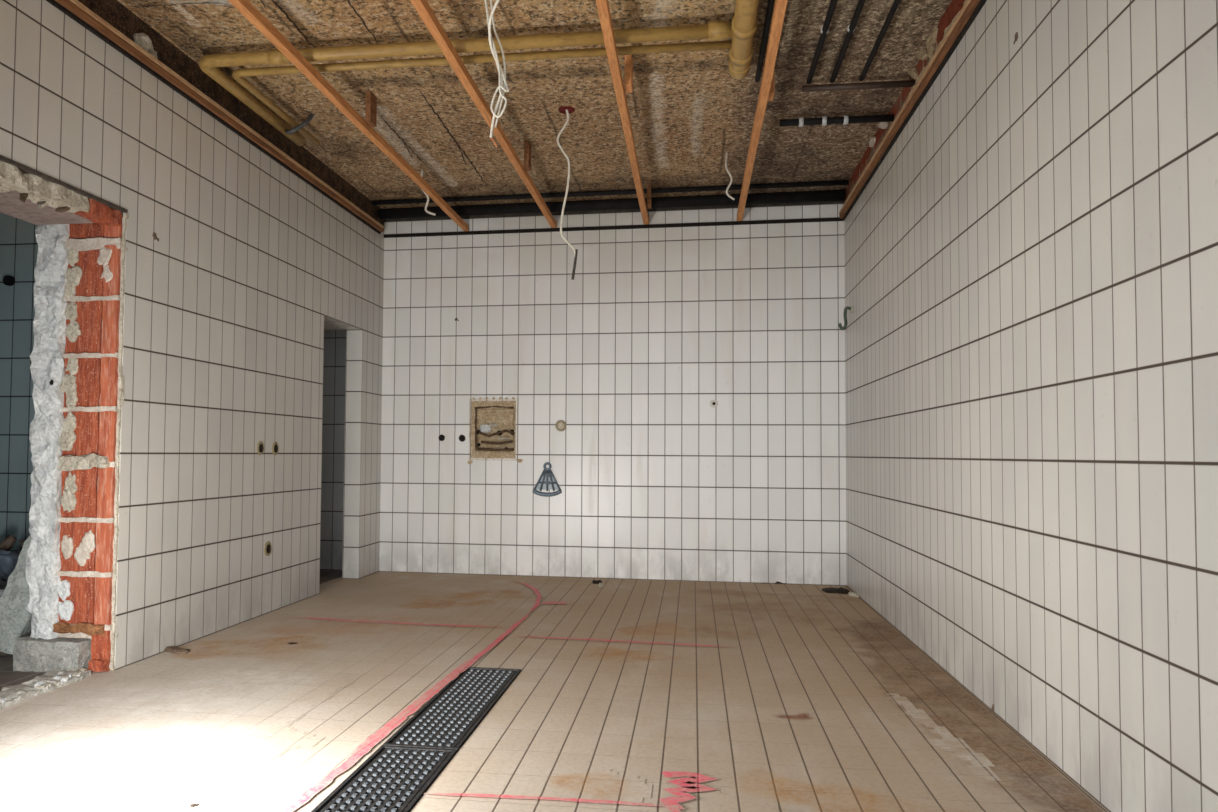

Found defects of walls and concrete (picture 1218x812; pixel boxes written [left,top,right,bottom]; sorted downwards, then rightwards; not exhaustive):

flaking render [0,161,122,226]
flaking render [64,247,82,342]
flaking render [97,247,113,283]
flaking render [59,358,79,451]
spalling [0,668,91,710]
leakage [816,616,1103,812]